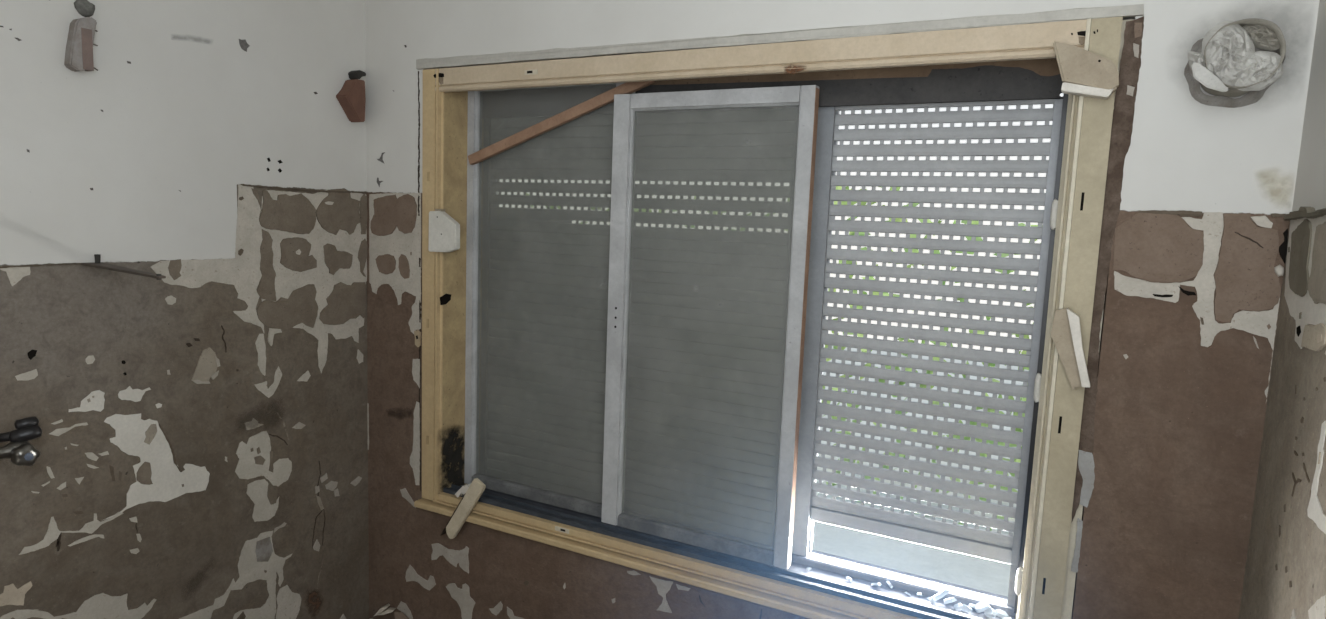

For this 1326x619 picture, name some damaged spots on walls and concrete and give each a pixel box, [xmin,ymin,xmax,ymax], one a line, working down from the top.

spalling [1271,213,1288,263]
spalling [186,338,220,384]
flaking render [31,443,122,497]
peeling [68,534,104,546]
flaking render [129,517,142,554]